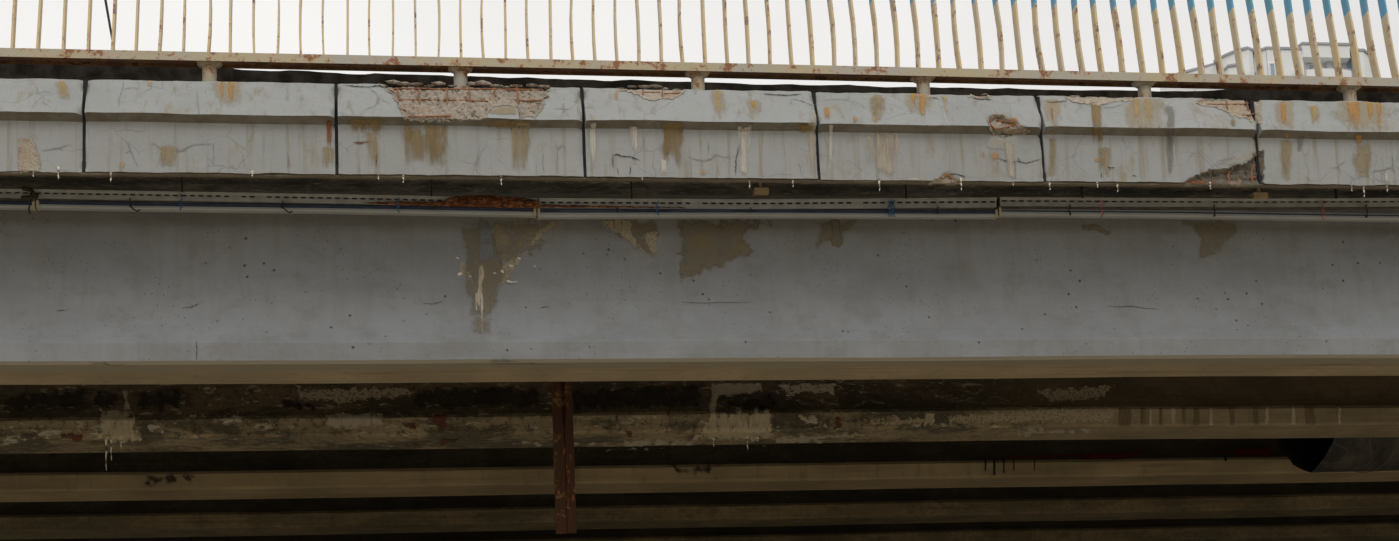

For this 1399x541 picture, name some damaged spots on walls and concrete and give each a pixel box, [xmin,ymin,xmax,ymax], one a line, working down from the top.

spalling [378,80,551,122]
spalling [968,93,1030,137]
spalling [1196,98,1262,124]
leakage [405,125,447,159]
leakage [485,120,530,158]
leakage [661,122,684,171]
spalling [1179,144,1266,188]
corrosion [367,195,684,209]
leakage [463,228,504,333]
leakage [2,389,242,445]
leakage [572,379,1213,473]